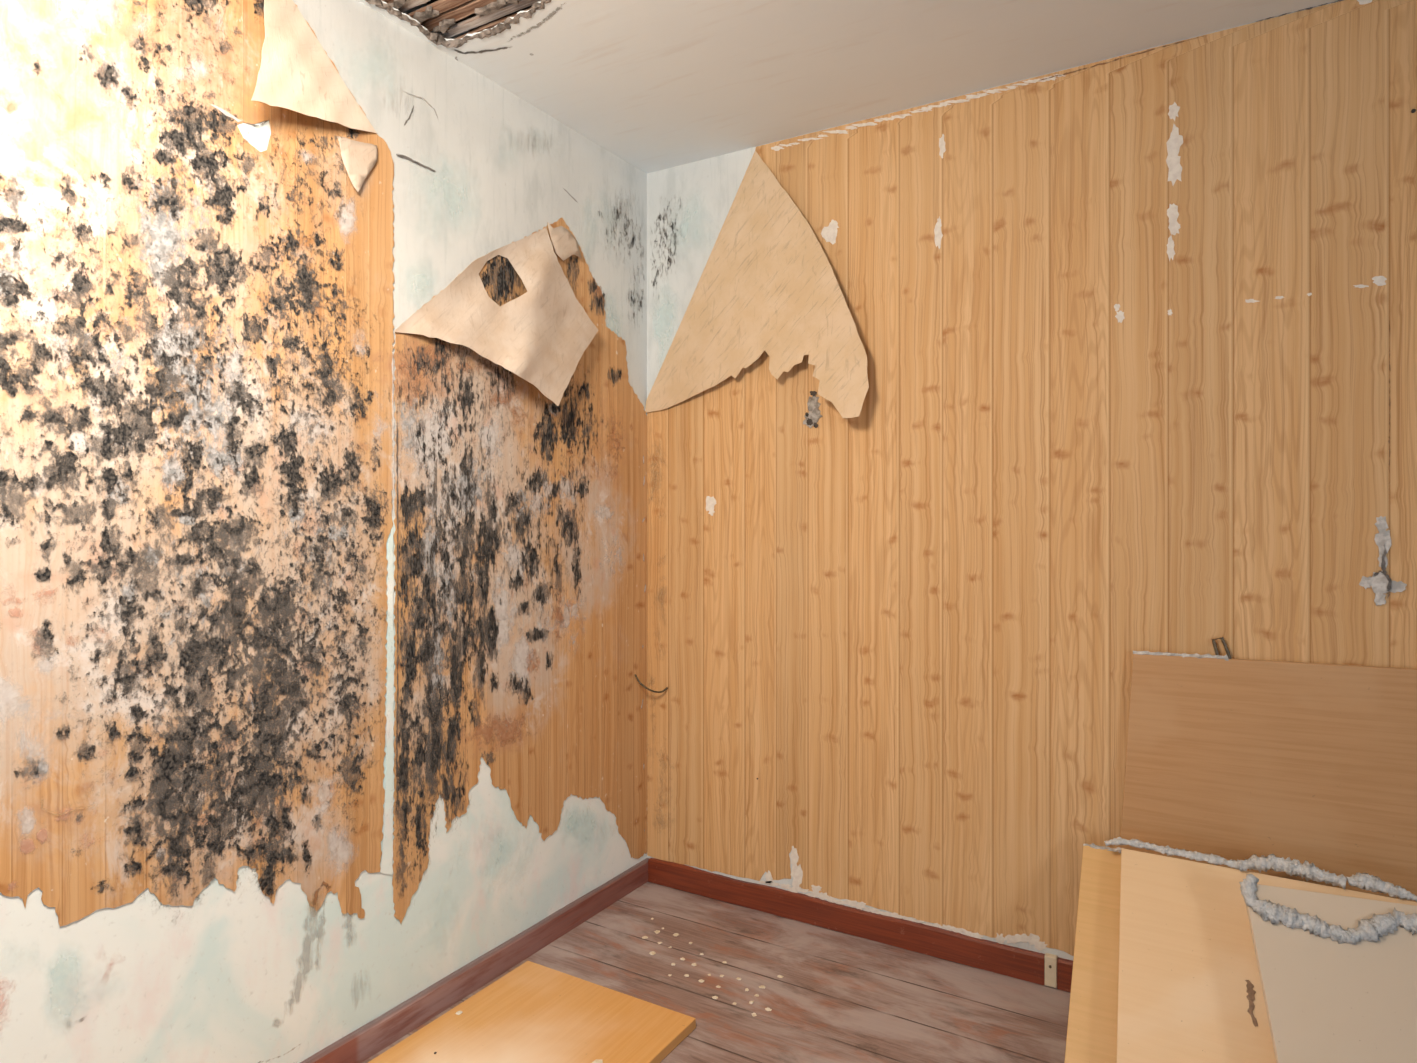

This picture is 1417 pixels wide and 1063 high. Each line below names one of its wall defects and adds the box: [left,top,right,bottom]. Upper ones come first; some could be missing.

spalling [365,0,551,48]
peeling [1166,102,1183,186]
peeling [821,220,839,245]
peeling [1167,203,1181,262]
damp [0,0,622,1003]
flaking render [0,516,647,1063]